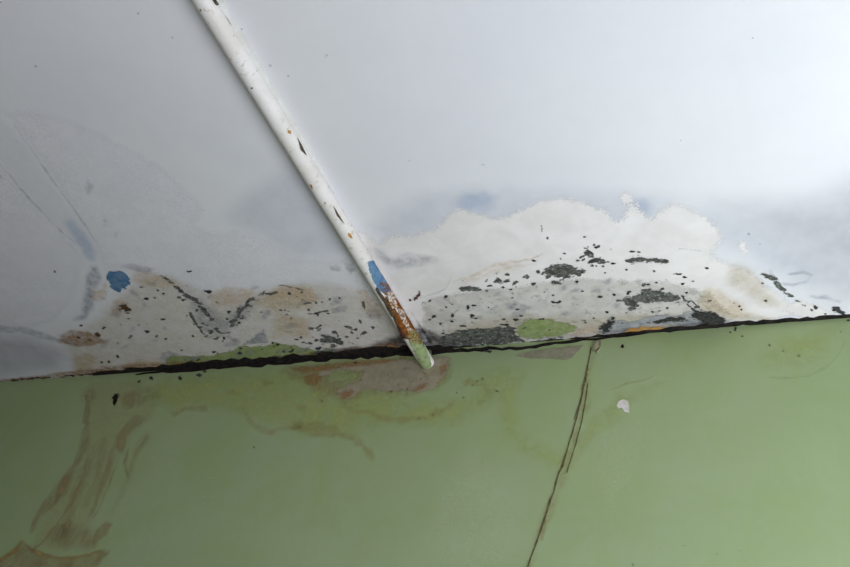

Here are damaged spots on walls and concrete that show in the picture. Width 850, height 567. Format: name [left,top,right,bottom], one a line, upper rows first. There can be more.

peeling [107,271,132,314]
peeling [160,275,375,365]
peeling [368,260,411,339]
peeling [293,305,586,399]
peeling [459,236,669,292]
water stain [357,191,836,346]
peeling [598,283,726,335]
crack [0,273,850,567]